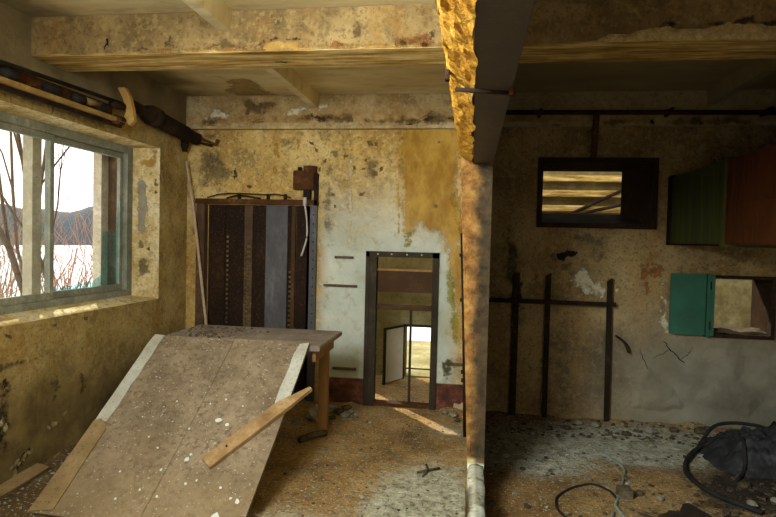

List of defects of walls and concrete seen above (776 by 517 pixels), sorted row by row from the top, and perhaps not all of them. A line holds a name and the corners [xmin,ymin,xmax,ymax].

water stain [225,79,277,123]
water stain [300,113,353,123]
spalling [550,250,578,261]
peeling [570,269,606,298]
crack [641,341,692,369]